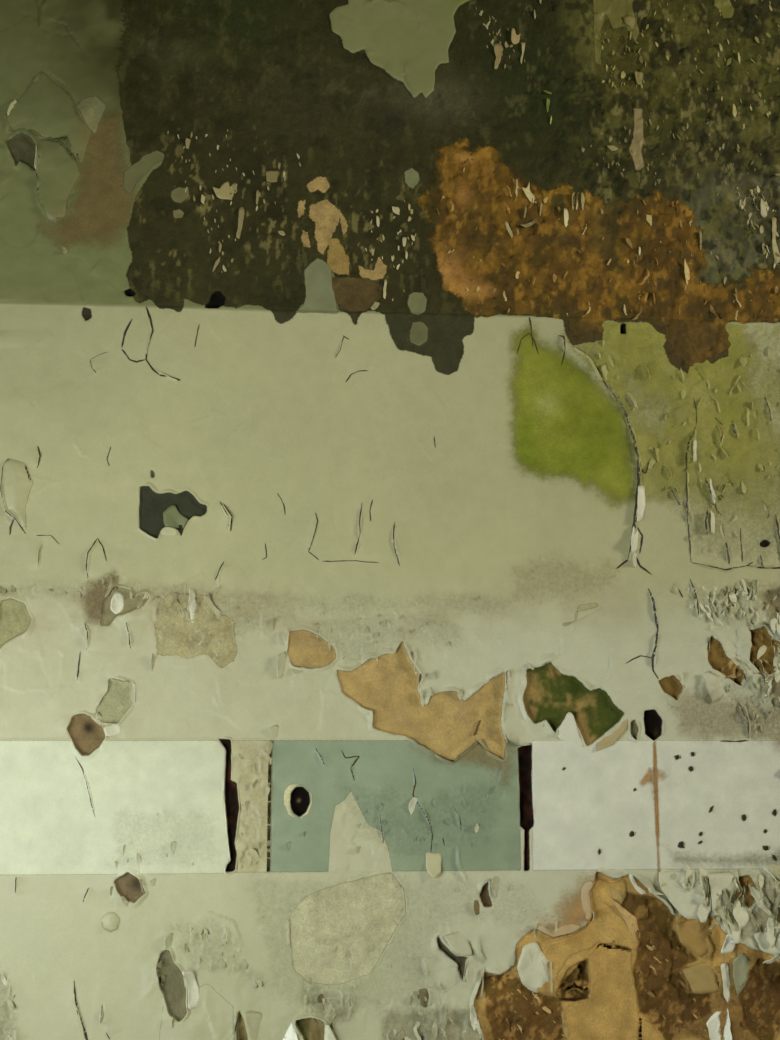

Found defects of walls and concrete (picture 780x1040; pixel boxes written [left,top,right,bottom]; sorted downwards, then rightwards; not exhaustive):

damp [51,0,780,375]
rust [419,138,780,367]
crack [90,307,180,382]
peeling [137,470,210,541]
peeling [631,486,646,567]
peeling [0,575,237,671]
peeling [62,675,137,760]
peeling [273,618,691,764]
spalling [283,784,312,837]
spalling [110,840,156,909]
peeling [152,923,262,1028]
peeling [385,846,780,1040]